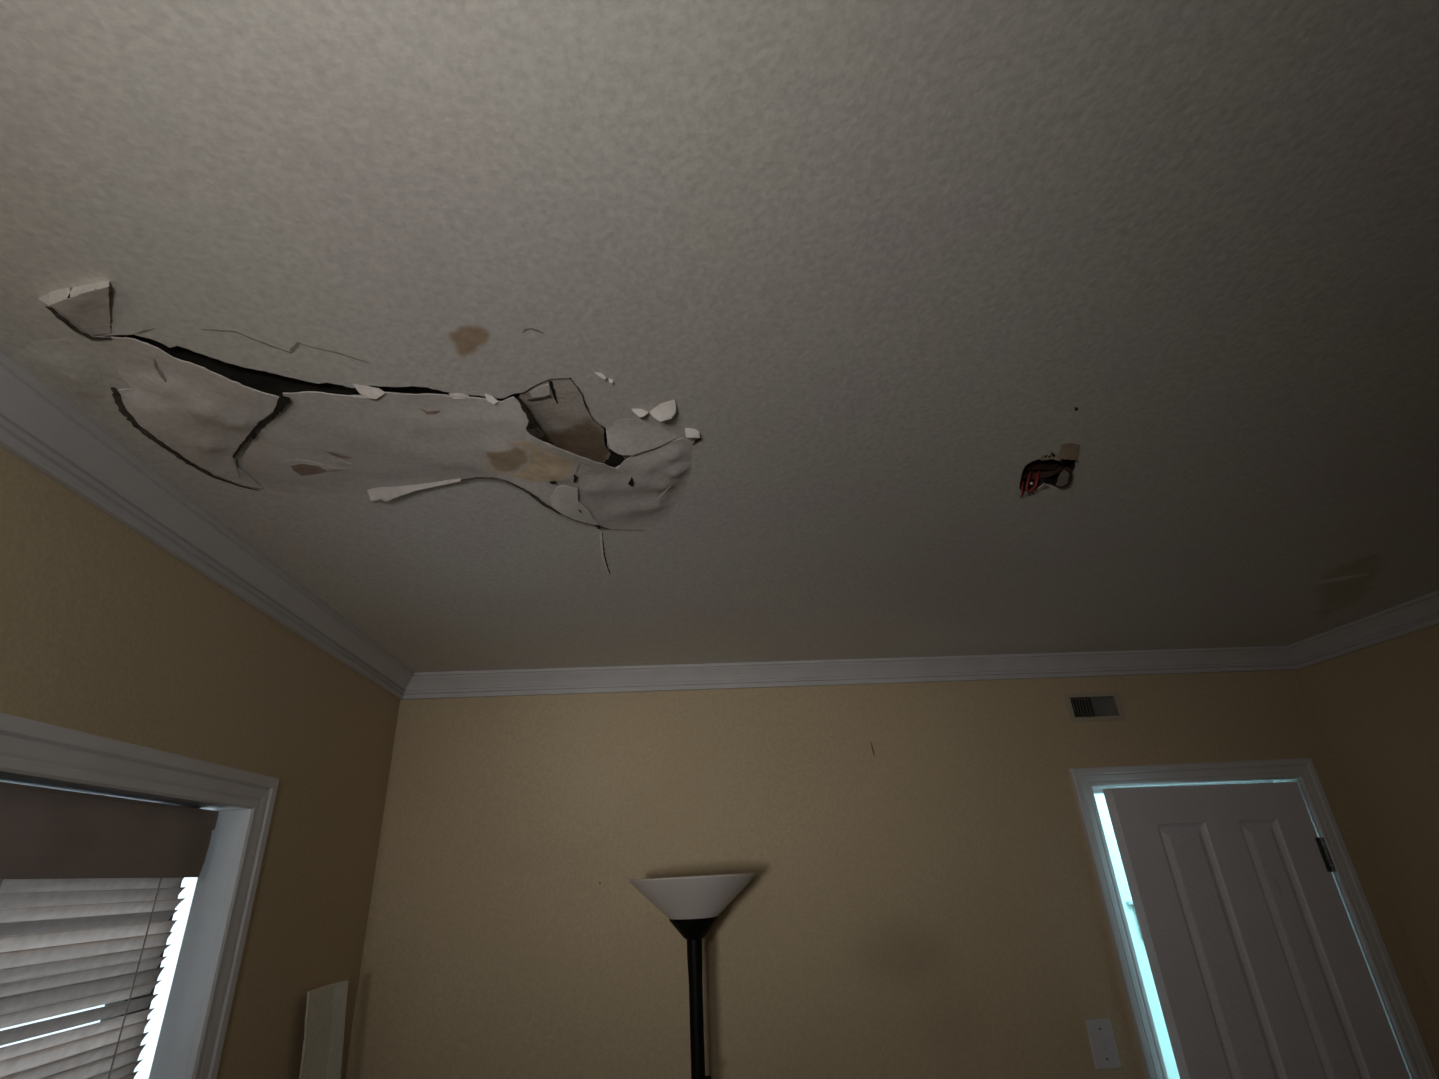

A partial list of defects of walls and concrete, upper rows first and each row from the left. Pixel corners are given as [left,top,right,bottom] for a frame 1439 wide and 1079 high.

crack [45,306,515,478]
peeling [353,384,385,399]
peeling [449,393,498,404]
spalling [520,378,625,467]
peeling [631,400,700,438]
spalling [282,451,352,475]
peeling [368,477,492,502]
leakage [477,439,580,484]
hole [1020,454,1075,492]
crack [599,529,645,574]